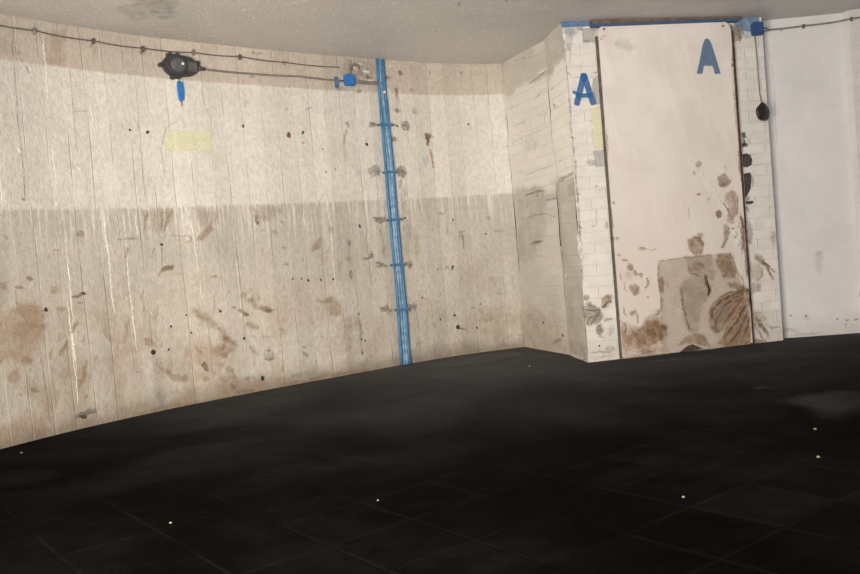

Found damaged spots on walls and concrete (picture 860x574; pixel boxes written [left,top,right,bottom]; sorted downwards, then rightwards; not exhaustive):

peeling [730,216,753,276]